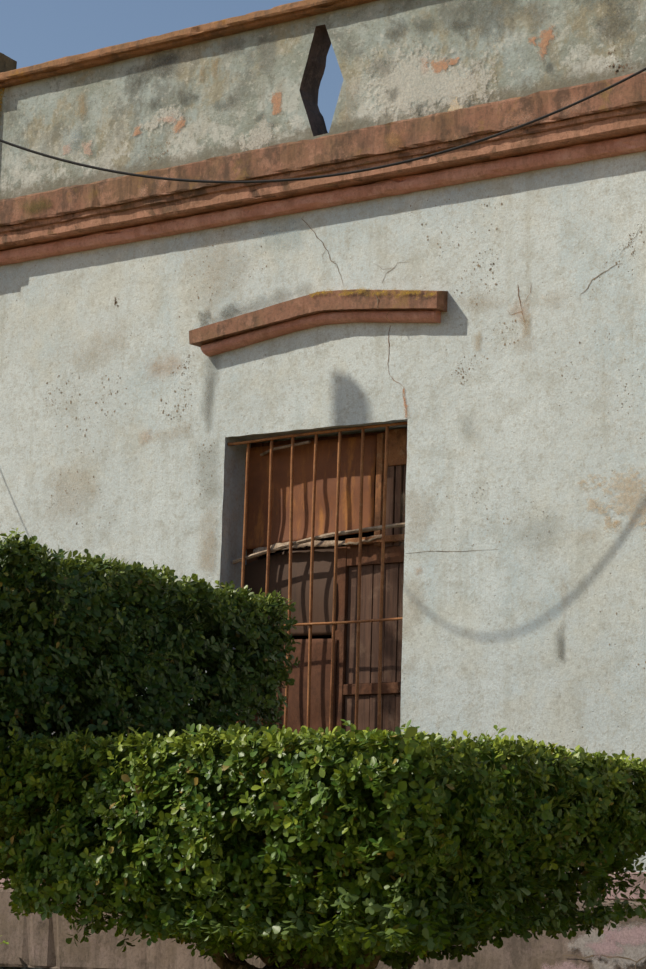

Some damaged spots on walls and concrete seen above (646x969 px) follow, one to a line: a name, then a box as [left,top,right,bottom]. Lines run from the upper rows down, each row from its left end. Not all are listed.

crack [301,218,343,283]
crack [375,262,407,418]
rust [242,435,377,550]